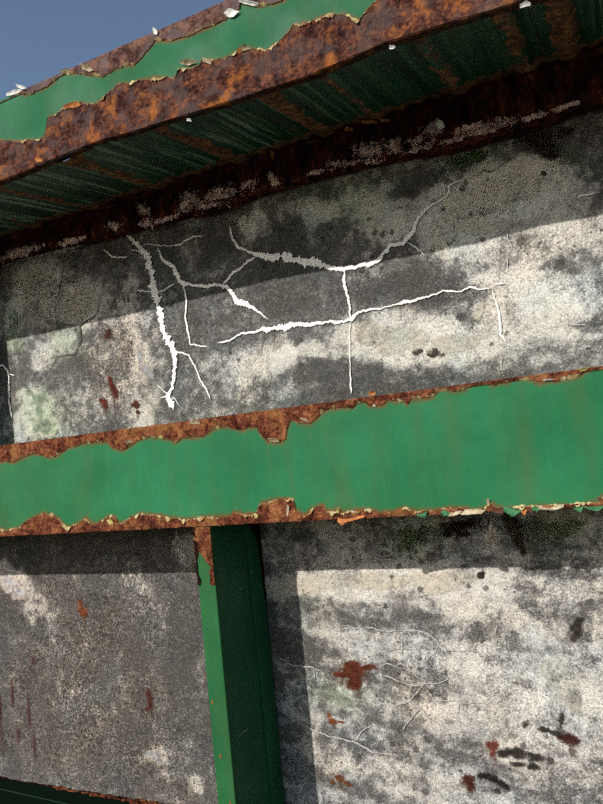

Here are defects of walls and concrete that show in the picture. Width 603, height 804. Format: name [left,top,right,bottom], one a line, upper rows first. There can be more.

corrosion [0,0,531,180]
corrosion [0,44,603,267]
peeling [428,168,547,250]
crack [103,156,515,409]
peeling [473,301,484,321]
peeling [354,319,480,357]
crack [0,365,13,417]
corrosion [0,366,603,462]
corrosion [332,660,377,690]
leakage [538,713,564,736]
leakage [477,772,509,793]
leakage [497,747,545,771]